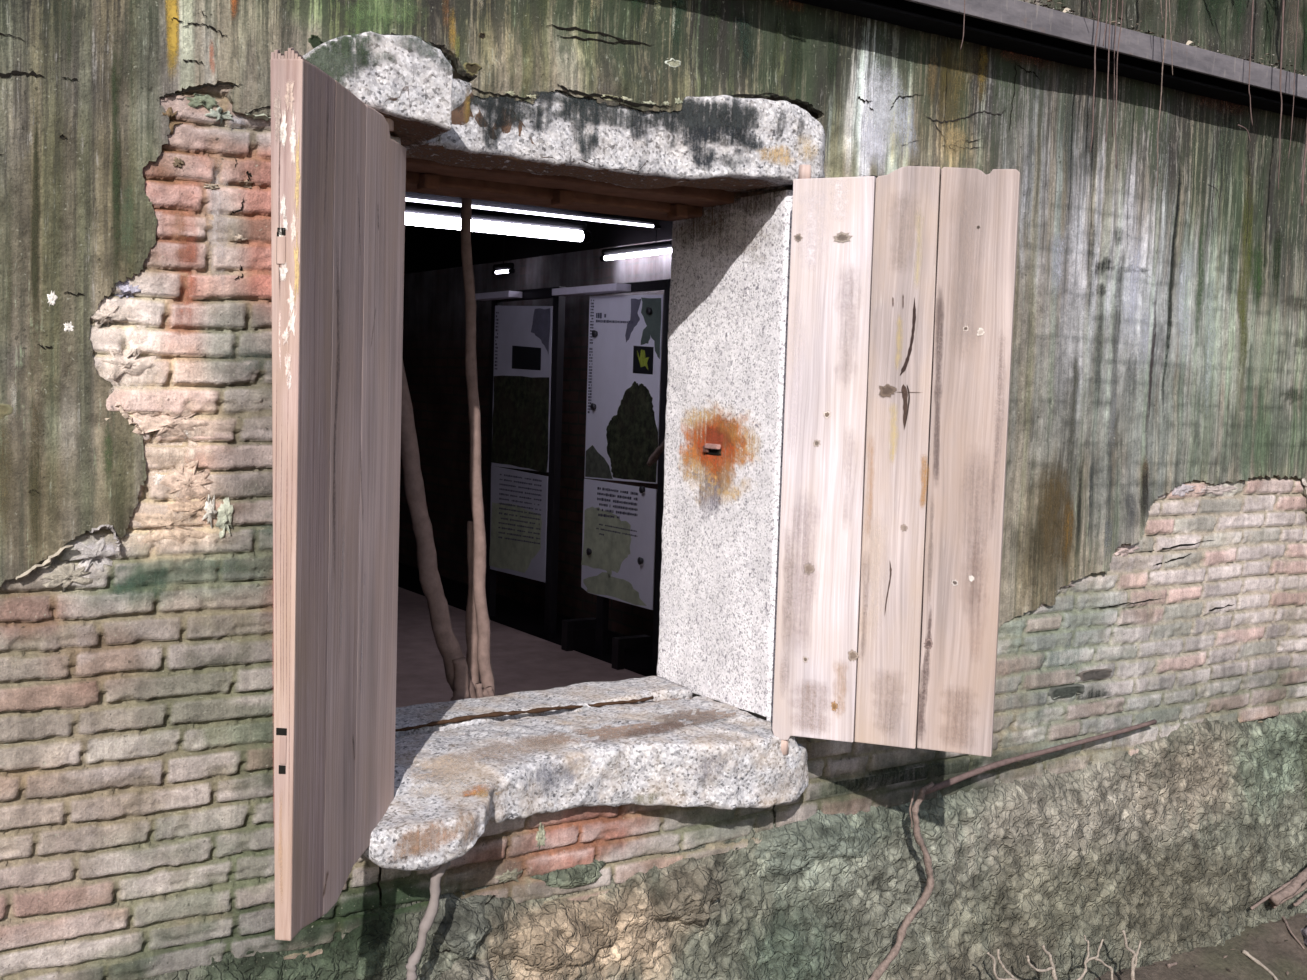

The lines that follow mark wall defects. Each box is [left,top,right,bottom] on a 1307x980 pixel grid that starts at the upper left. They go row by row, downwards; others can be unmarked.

crack [0,33,78,81]
spalling [308,35,323,48]
crack [548,24,651,46]
leakage [457,91,762,169]
leakage [31,127,39,321]
leakage [1088,170,1215,424]
leakage [1229,198,1281,372]
rust [680,410,755,497]
peeling [0,82,440,980]
crack [395,696,654,732]
crack [692,693,767,720]
peeling [440,475,1307,904]